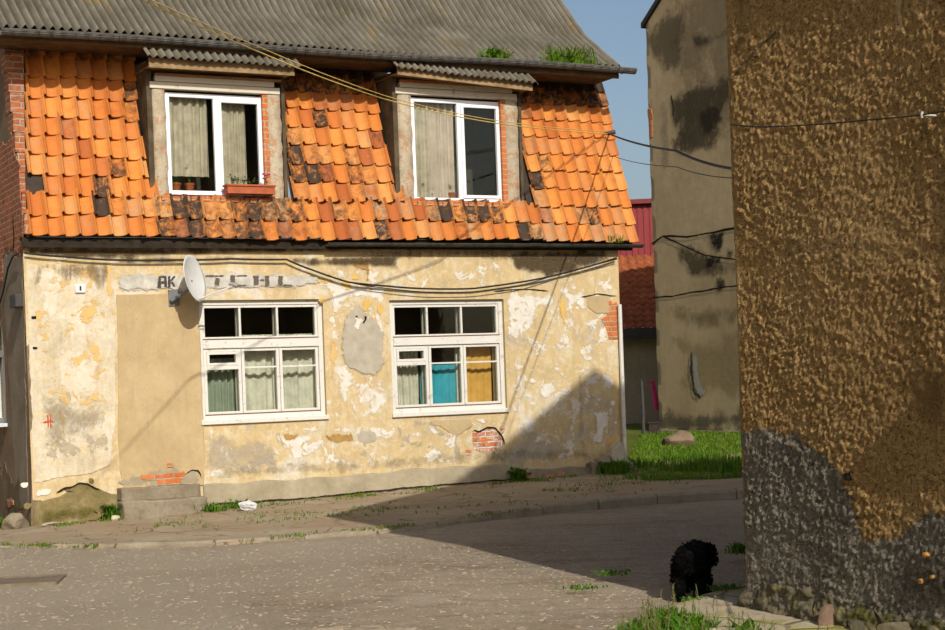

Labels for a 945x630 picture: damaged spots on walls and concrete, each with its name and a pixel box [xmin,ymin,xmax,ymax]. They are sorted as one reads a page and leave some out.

leakage [650,16,681,70]
leakage [673,79,729,151]
peeling [452,262,507,286]
peeling [0,132,117,519]
peeling [210,267,505,476]
peeling [507,265,637,474]
spalling [119,463,199,486]